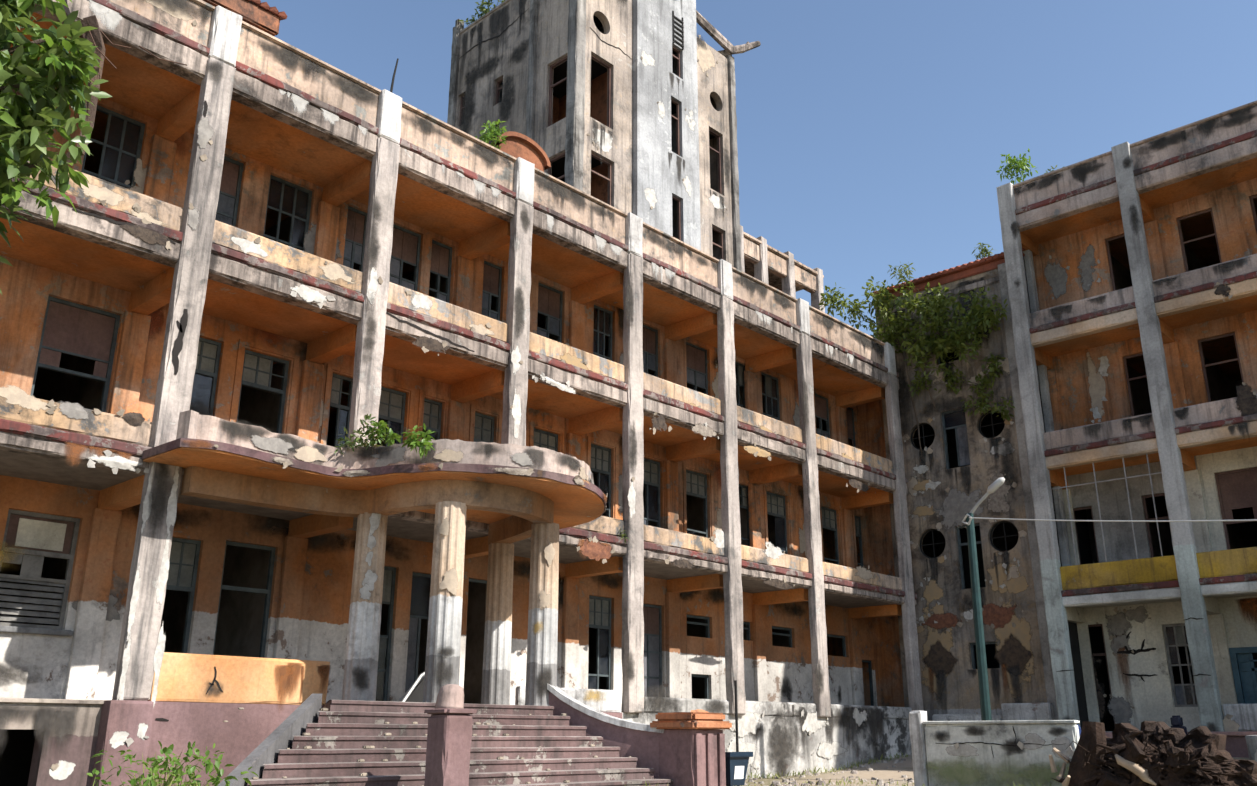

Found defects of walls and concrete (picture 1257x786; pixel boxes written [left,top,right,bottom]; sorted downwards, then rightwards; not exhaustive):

leakage [409,0,529,166]
leakage [442,164,501,196]
crack [386,312,475,352]
spalling [87,450,154,534]
peeling [156,466,179,608]
peeling [106,563,141,700]
peeling [152,623,166,708]
crack [1117,632,1157,682]
corrosion [1238,597,1257,620]
peeling [109,723,149,749]
peeling [727,711,765,773]
peeling [801,709,849,759]